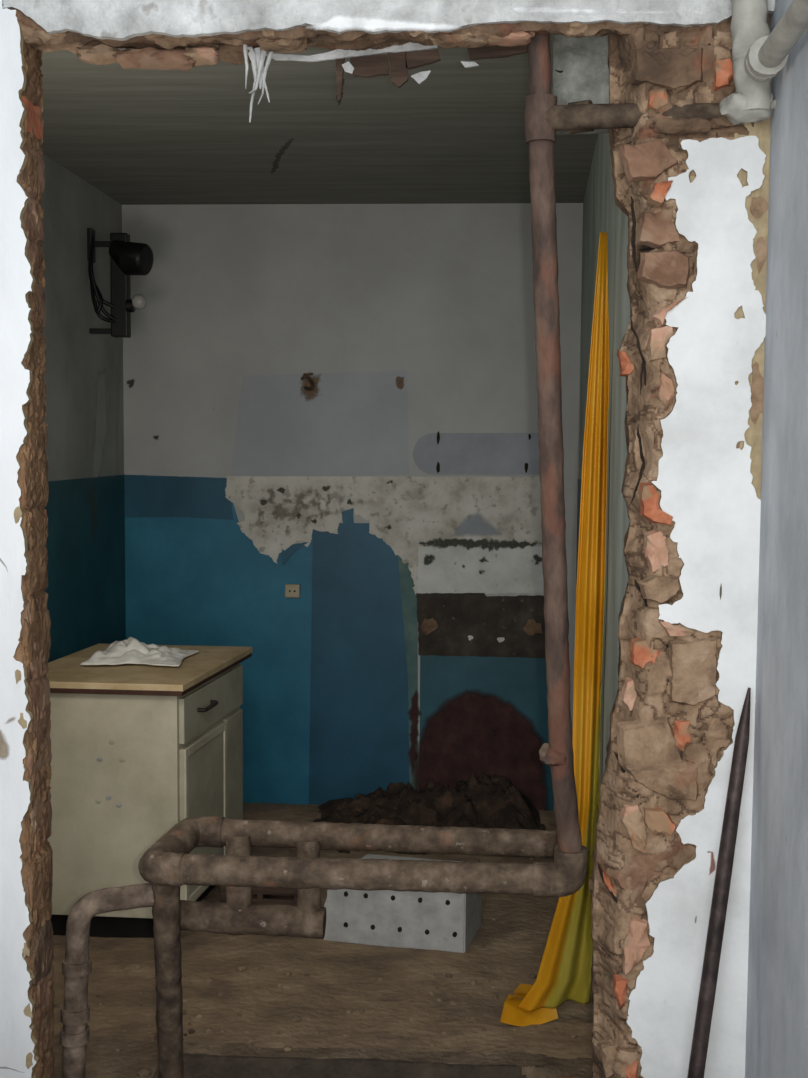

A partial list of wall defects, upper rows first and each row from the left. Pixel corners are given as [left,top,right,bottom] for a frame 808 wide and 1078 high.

spalling [13,8,632,1078]
spalling [589,17,771,1078]